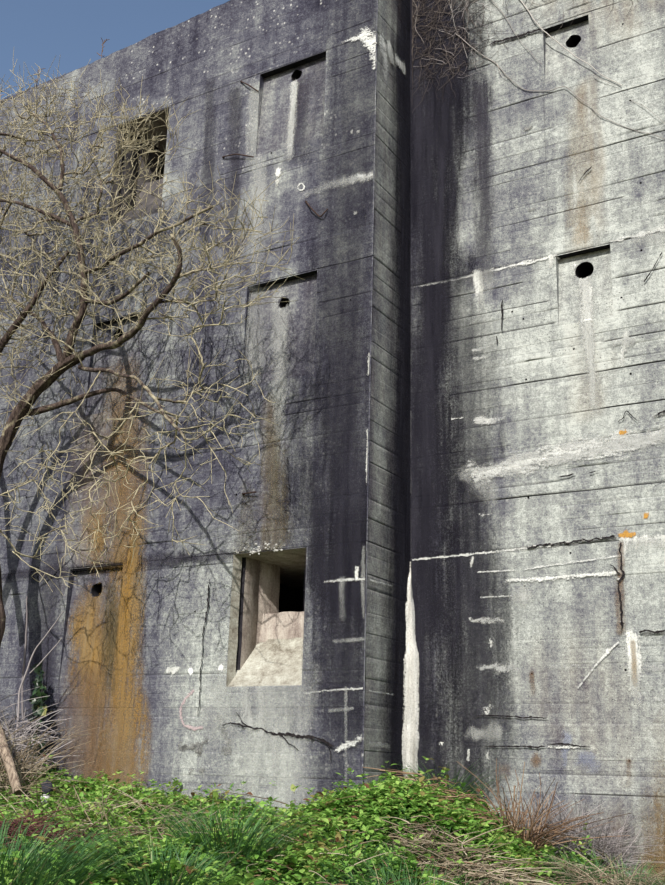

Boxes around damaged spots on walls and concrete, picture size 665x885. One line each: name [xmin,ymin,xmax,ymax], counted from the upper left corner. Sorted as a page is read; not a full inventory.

spalling [347,27,406,75]
water stain [275,0,665,791]
crack [618,410,665,422]
crack [610,543,665,635]
rust [68,510,150,787]
crack [198,579,210,711]
crack [223,712,334,762]